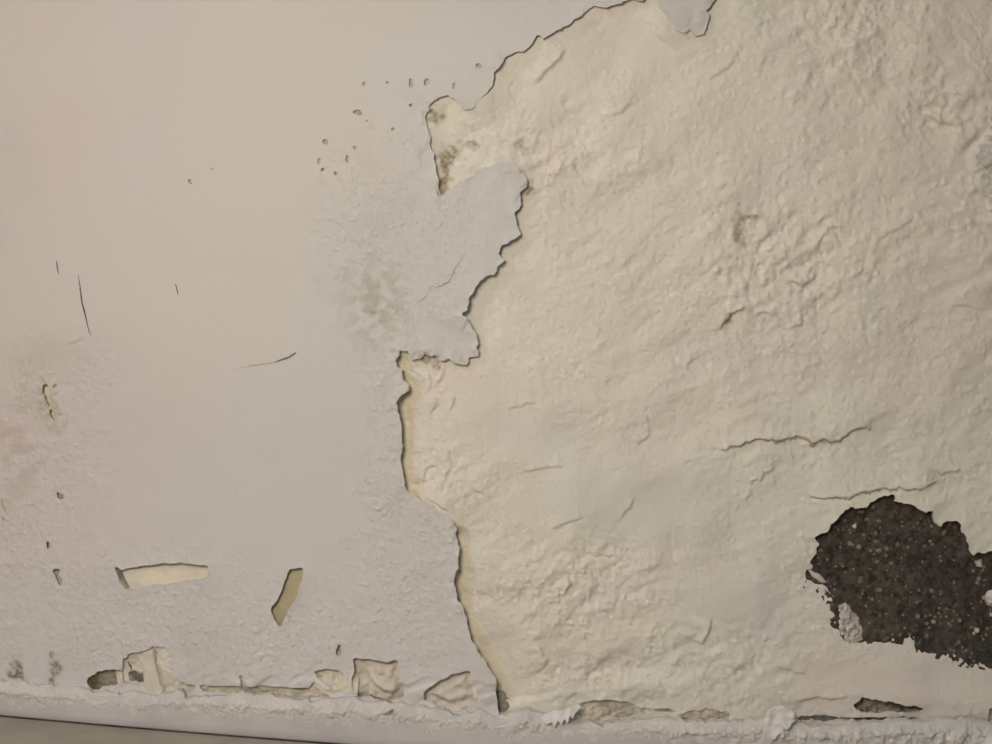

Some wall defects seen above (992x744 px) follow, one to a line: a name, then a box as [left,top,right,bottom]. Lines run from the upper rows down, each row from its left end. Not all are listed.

peeling [407,0,992,744]
crack [722,428,875,451]
peeling [115,563,208,589]
peeling [271,568,303,626]
peeling [116,646,194,695]
peeling [312,658,405,715]